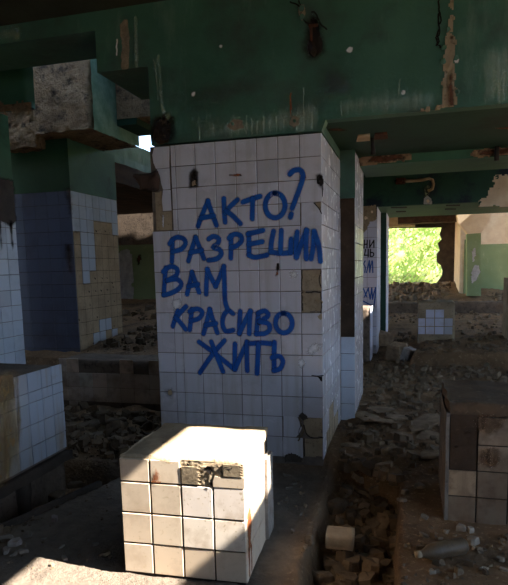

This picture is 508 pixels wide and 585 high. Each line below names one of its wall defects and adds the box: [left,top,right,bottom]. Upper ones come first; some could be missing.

peeling [421,0,460,112]
spalling [0,60,136,153]
spalling [155,191,172,230]
peeling [478,174,508,207]
spalling [74,222,144,350]
spalling [301,270,323,320]
spalling [181,460,243,487]